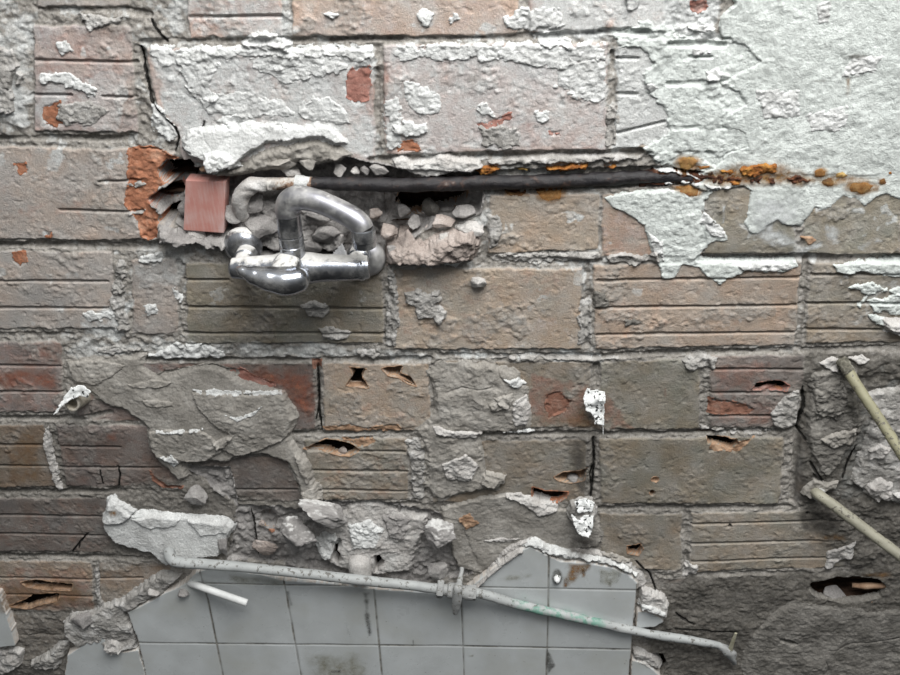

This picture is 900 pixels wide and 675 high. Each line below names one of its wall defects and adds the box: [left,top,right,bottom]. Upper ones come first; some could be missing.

crack [141,19,180,152]
flaking render [124,120,483,241]
flaking render [605,0,900,285]
rust [639,157,892,197]
spalling [320,189,486,260]
crack [315,365,323,430]
peeling [583,388,606,432]
crack [794,386,806,440]
spalling [102,464,473,582]
peeling [442,454,598,538]
crack [588,439,596,496]
crack [810,445,856,481]